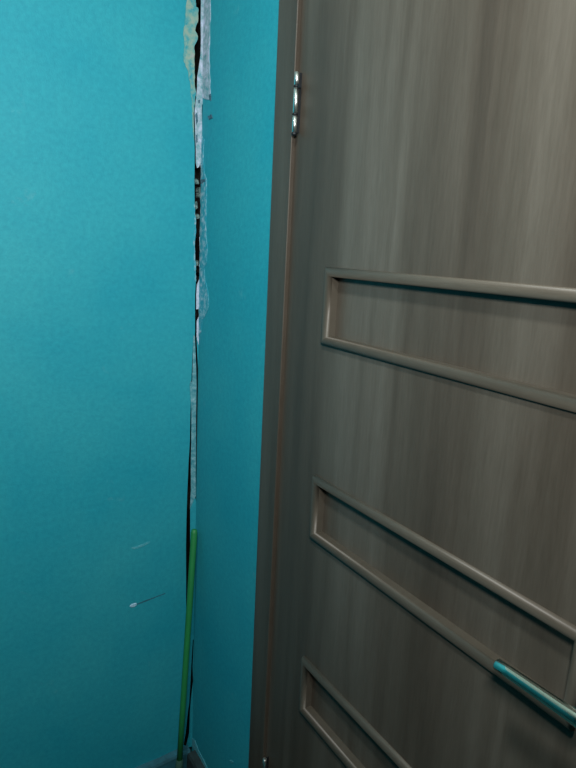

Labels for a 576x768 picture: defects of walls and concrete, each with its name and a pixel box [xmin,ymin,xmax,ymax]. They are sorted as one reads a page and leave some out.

crack [193,0,201,387]
peeling [183,0,213,345]
crack [186,415,196,600]